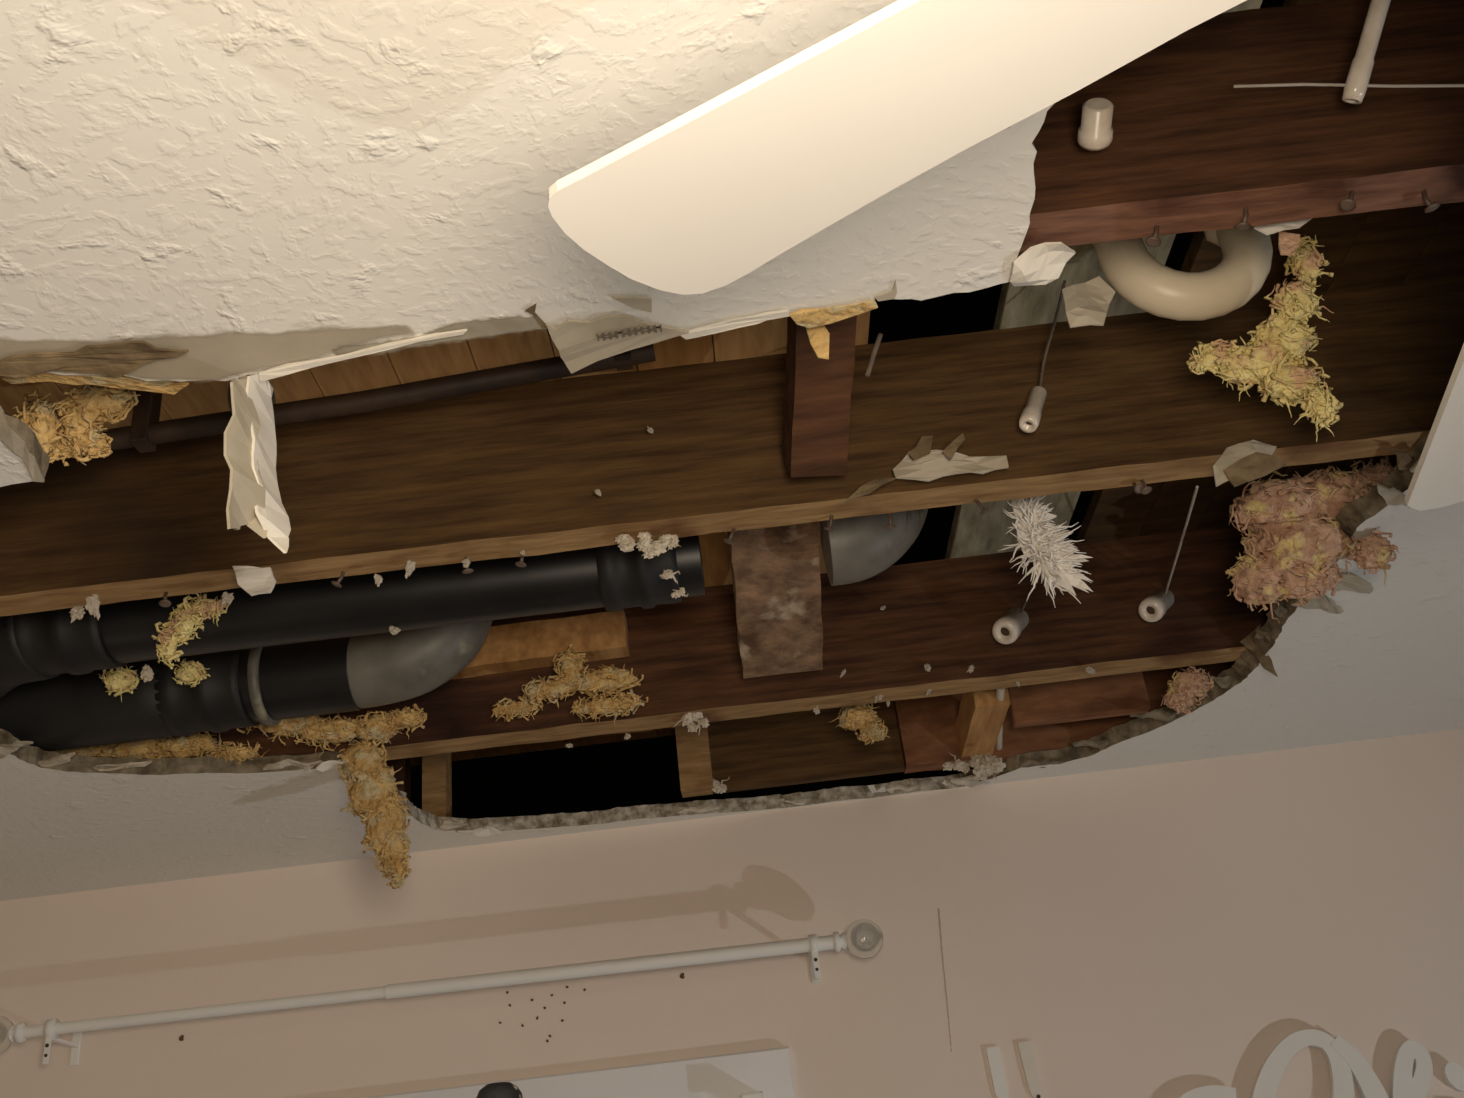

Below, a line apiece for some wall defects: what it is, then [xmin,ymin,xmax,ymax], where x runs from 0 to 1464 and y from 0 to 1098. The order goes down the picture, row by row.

peeling [0,316,542,382]
flaking render [1389,448,1419,473]
flaking render [1377,484,1410,508]
flaking render [232,566,276,596]
flaking render [1254,574,1374,643]
flaking render [0,740,33,759]
flaking render [38,752,75,767]
flaking render [93,761,152,771]
flaking render [263,759,350,772]
flaking render [1019,739,1111,768]
flaking render [439,821,501,837]